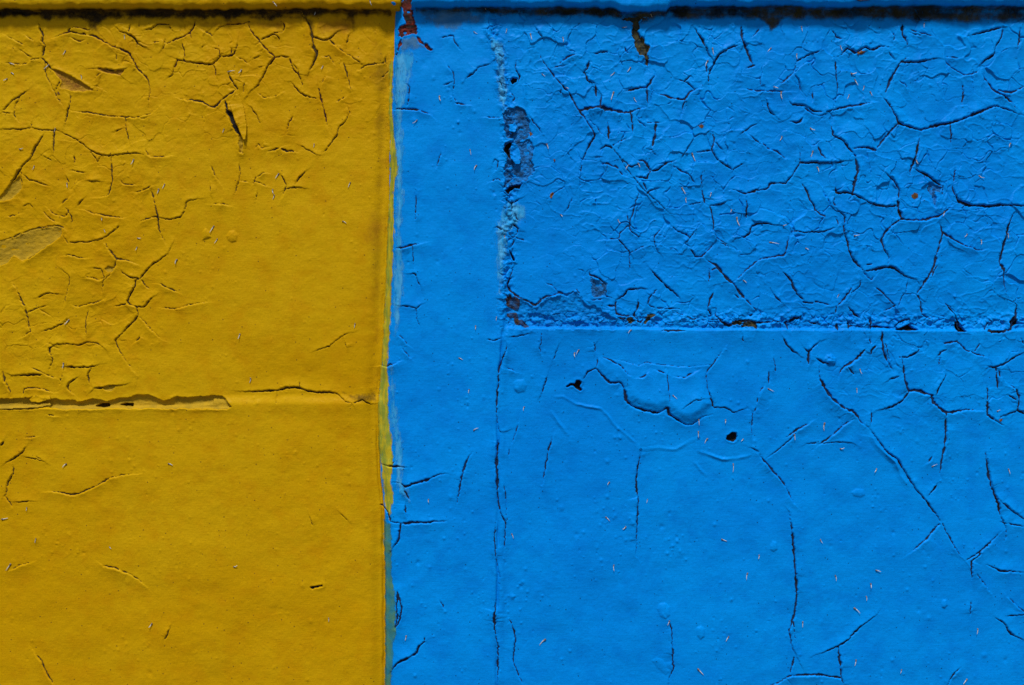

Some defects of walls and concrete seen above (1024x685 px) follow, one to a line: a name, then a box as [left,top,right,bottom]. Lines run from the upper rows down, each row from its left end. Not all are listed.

peeling [503,107,535,187]
peeling [0,226,62,266]
crack [3,18,428,416]
crack [442,25,1024,614]
peeling [0,386,231,410]
crack [1,436,41,505]
crack [381,456,469,545]
crack [395,591,403,628]
crack [392,638,425,670]
crack [493,603,522,681]
crack [772,522,873,685]
crack [996,599,1024,638]